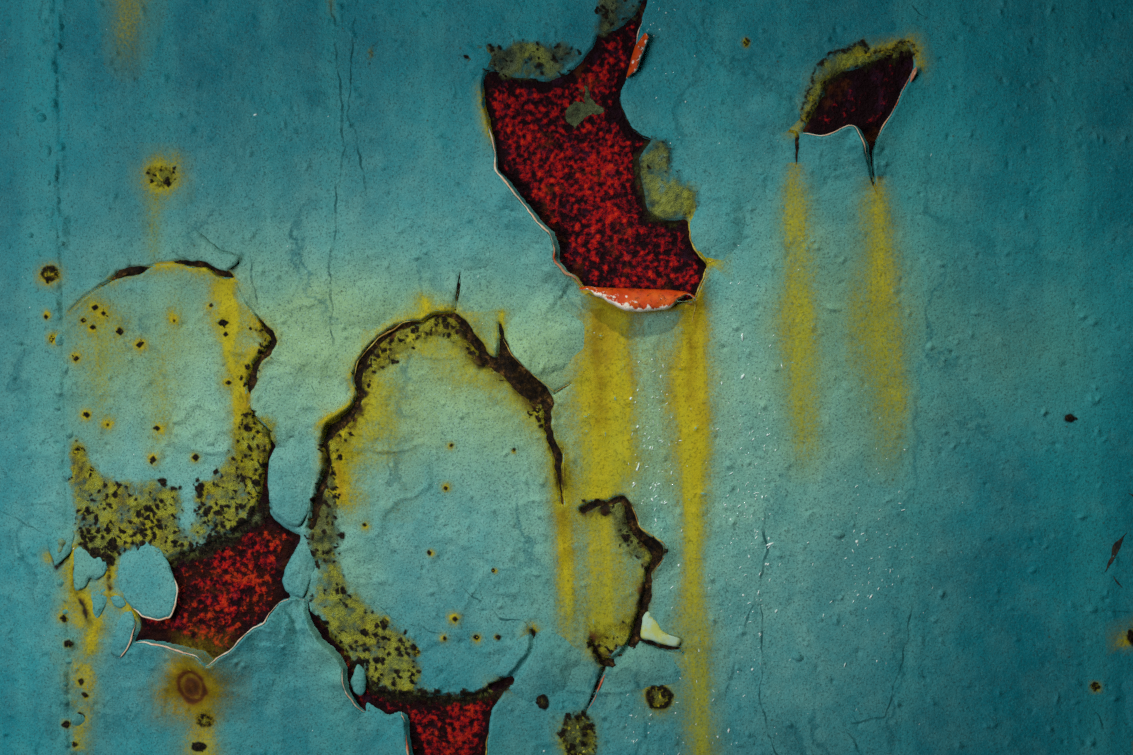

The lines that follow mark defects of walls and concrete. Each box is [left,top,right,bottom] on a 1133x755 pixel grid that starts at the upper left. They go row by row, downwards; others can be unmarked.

spalling [80,300,123,335]
spalling [132,338,147,353]
rust [144,155,181,225]
spalling [218,317,230,338]
peeling [462,0,746,332]
rust [777,163,818,450]
peeling [747,37,924,192]
rust [849,178,907,429]
peeling [45,384,514,755]
rust [553,300,641,649]
rust [643,288,714,755]
rust [556,710,597,755]